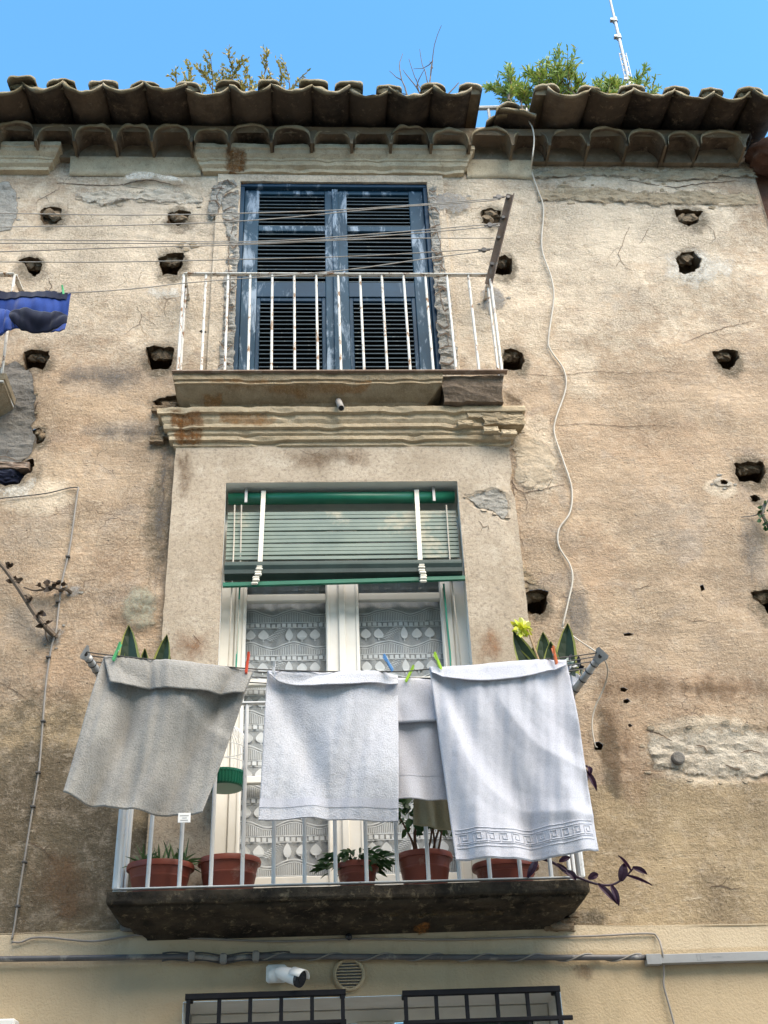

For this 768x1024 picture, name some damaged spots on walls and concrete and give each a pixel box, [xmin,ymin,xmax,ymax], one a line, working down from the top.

spalling [75,179,240,370]
peeling [0,349,50,472]
rust [170,410,203,445]
spalling [463,489,511,519]
crack [511,478,570,543]
spalling [639,719,768,784]